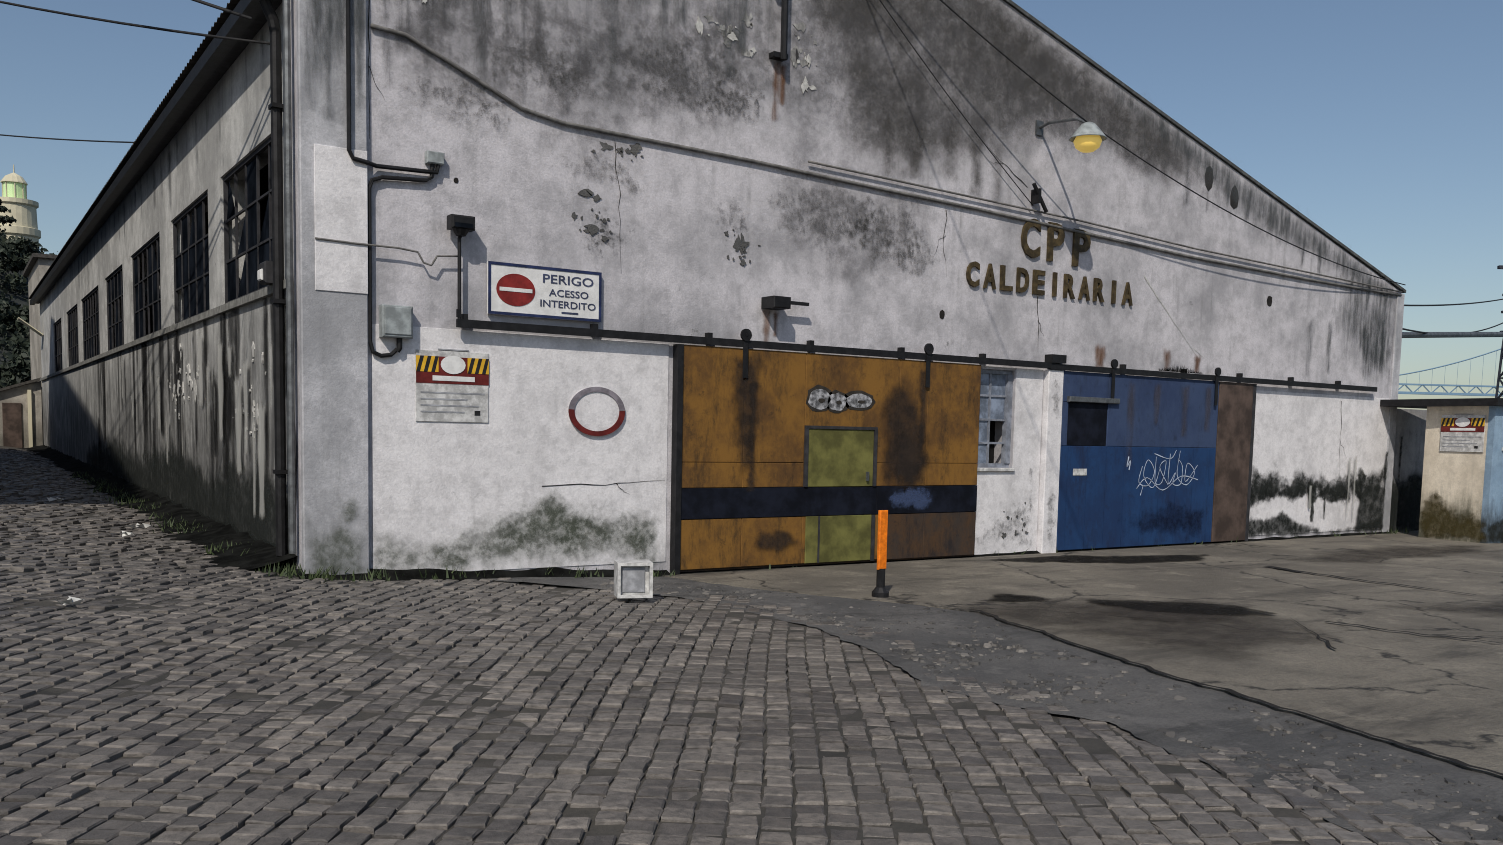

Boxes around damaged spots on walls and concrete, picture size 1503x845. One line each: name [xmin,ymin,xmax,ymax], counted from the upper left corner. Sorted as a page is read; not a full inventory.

damp [314,0,362,59]
spalling [592,141,644,161]
spalling [571,189,612,243]
damp [1160,123,1388,364]
damp [87,291,297,569]
damp [1248,437,1503,562]
mould [433,506,647,566]